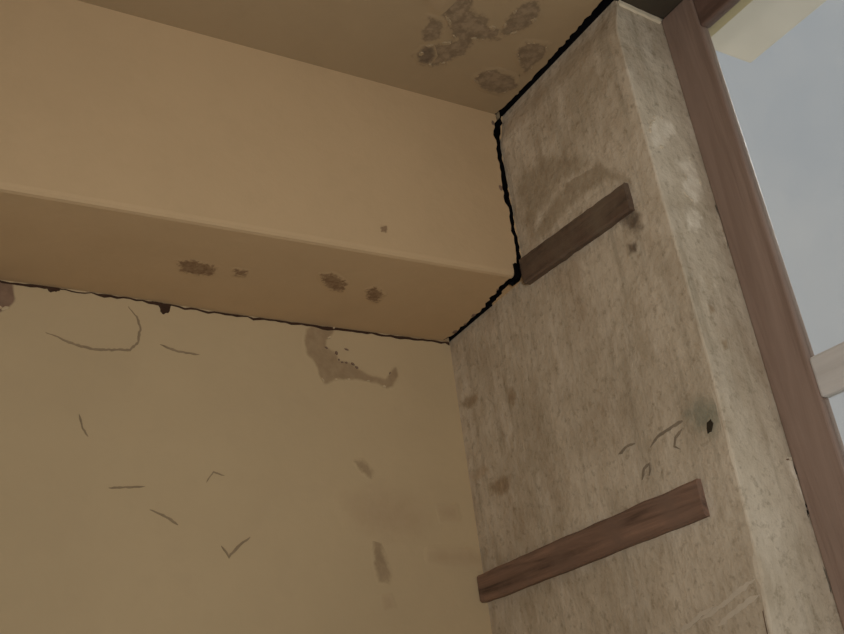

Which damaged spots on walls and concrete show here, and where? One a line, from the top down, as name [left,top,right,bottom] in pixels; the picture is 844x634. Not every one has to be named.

peeling [409,0,547,72]
crack [0,0,614,351]
spalling [0,280,19,318]
crack [160,344,199,355]
spalling [301,325,402,393]